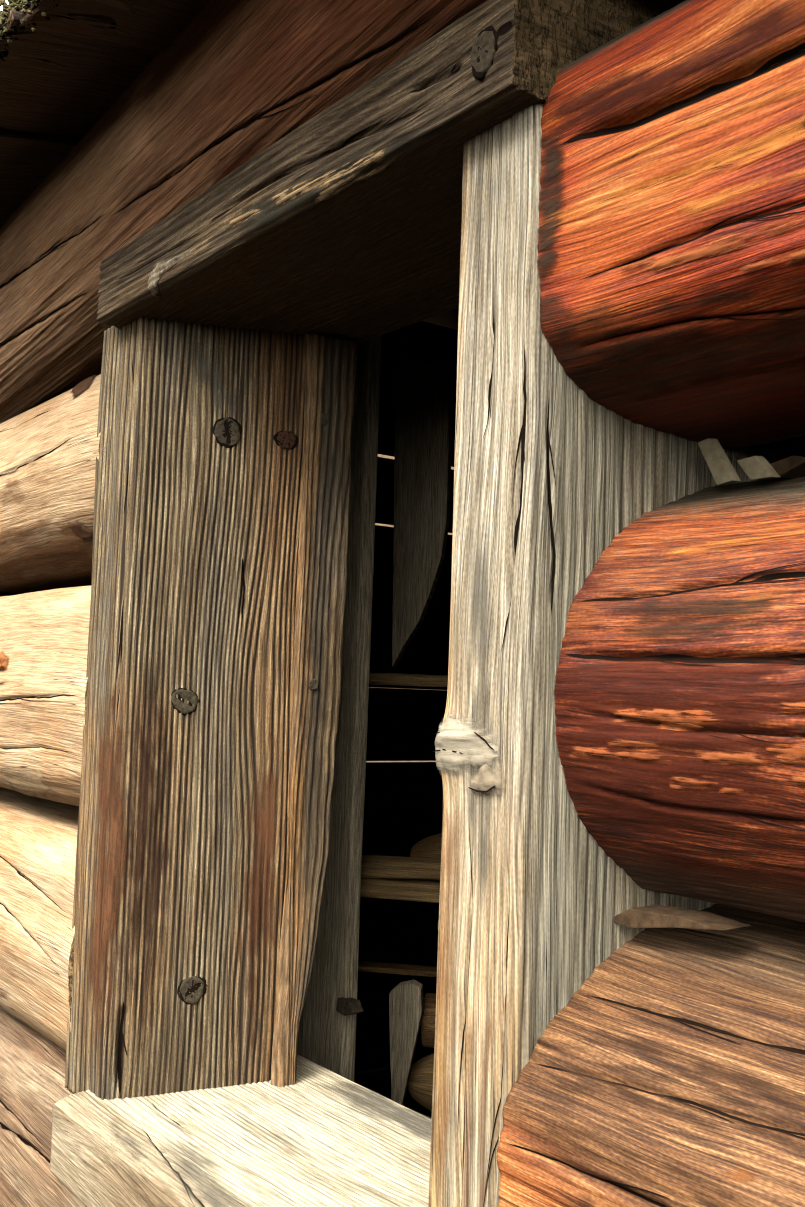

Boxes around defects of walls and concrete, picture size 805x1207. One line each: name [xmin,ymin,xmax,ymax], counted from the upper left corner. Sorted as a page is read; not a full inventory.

crack [497,21,512,35]
crack [560,42,805,145]
crack [0,12,464,289]
crack [598,150,761,203]
crack [483,322,495,438]
crack [512,349,805,618]
crack [500,595,512,658]
crack [567,653,805,667]
crack [458,828,805,1207]
crack [142,1104,205,1207]